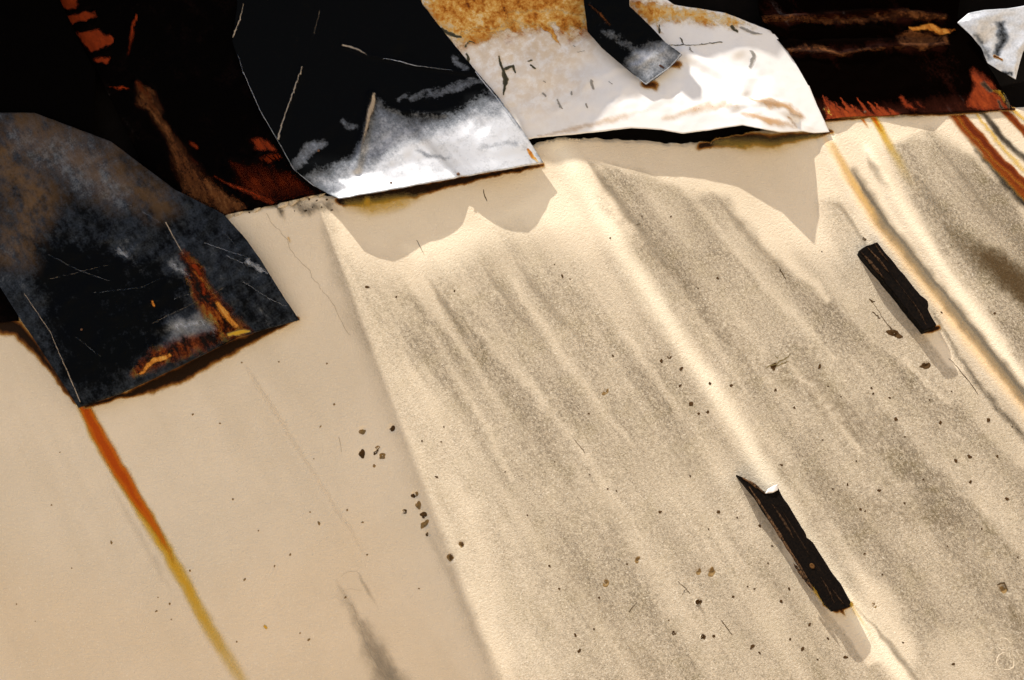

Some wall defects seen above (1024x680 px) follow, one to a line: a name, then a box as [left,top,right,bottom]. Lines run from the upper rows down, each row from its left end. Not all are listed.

peeling [442,28,475,63]
corrosion [421,0,610,46]
peeling [498,56,516,95]
corrosion [697,69,1024,199]
spalling [277,193,333,212]
corrosion [834,147,1024,402]
corrosion [0,252,300,671]